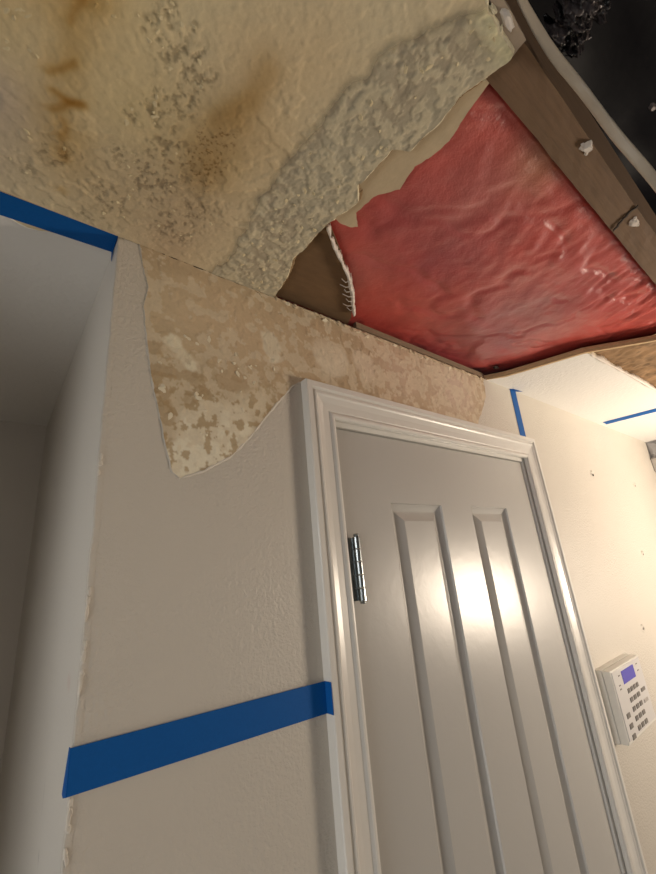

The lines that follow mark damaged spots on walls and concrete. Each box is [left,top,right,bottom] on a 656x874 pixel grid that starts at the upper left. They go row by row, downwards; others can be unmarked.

peeling [138,244,486,479]